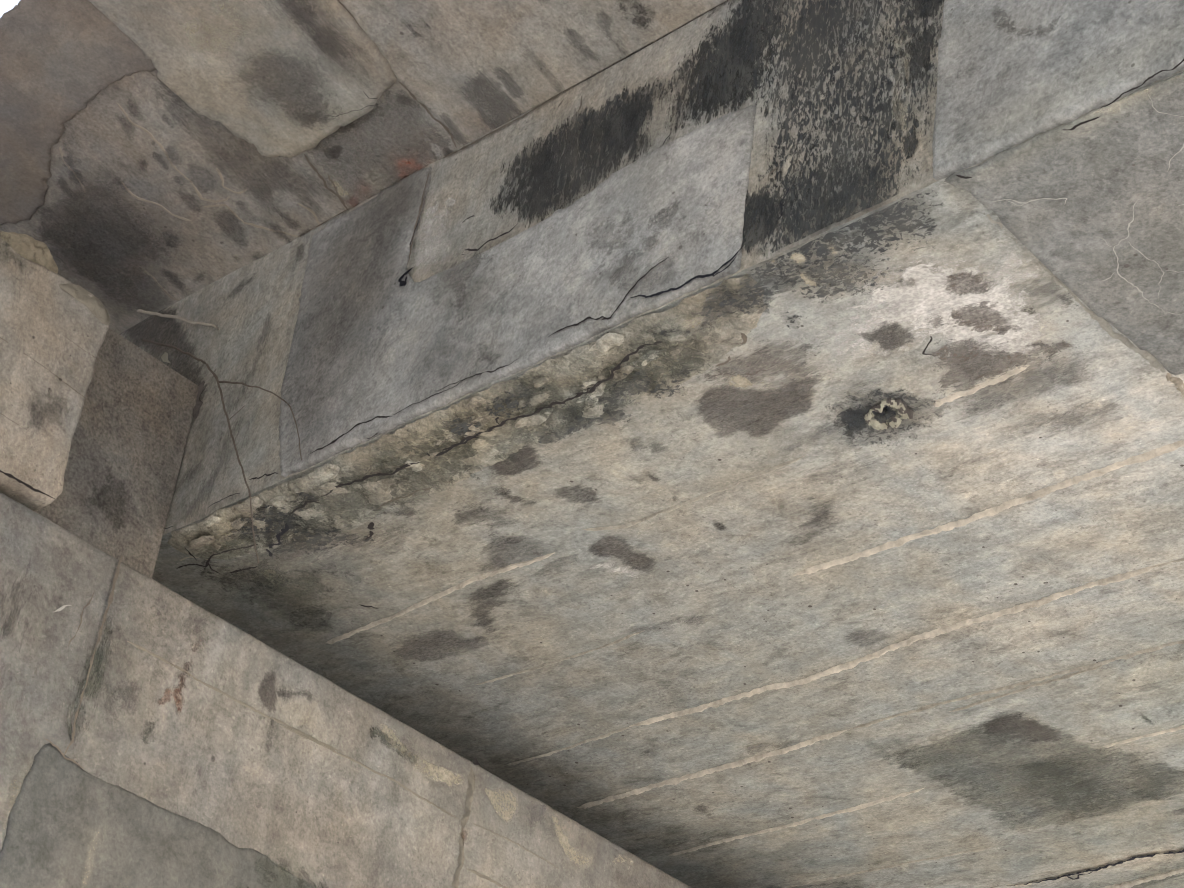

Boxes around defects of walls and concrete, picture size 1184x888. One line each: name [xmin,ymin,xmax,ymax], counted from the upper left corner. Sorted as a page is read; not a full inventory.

water stain [464,70,523,129]
crack [1063,59,1184,170]
water stain [488,0,1056,363]
water stain [121,309,205,401]
water stain [442,382,534,436]
water stain [491,311,822,476]
water stain [228,492,373,559]
crack [165,341,662,573]
water stain [556,487,598,502]
water stain [590,537,653,578]
water stain [897,714,1184,820]
crack [991,850,1184,888]